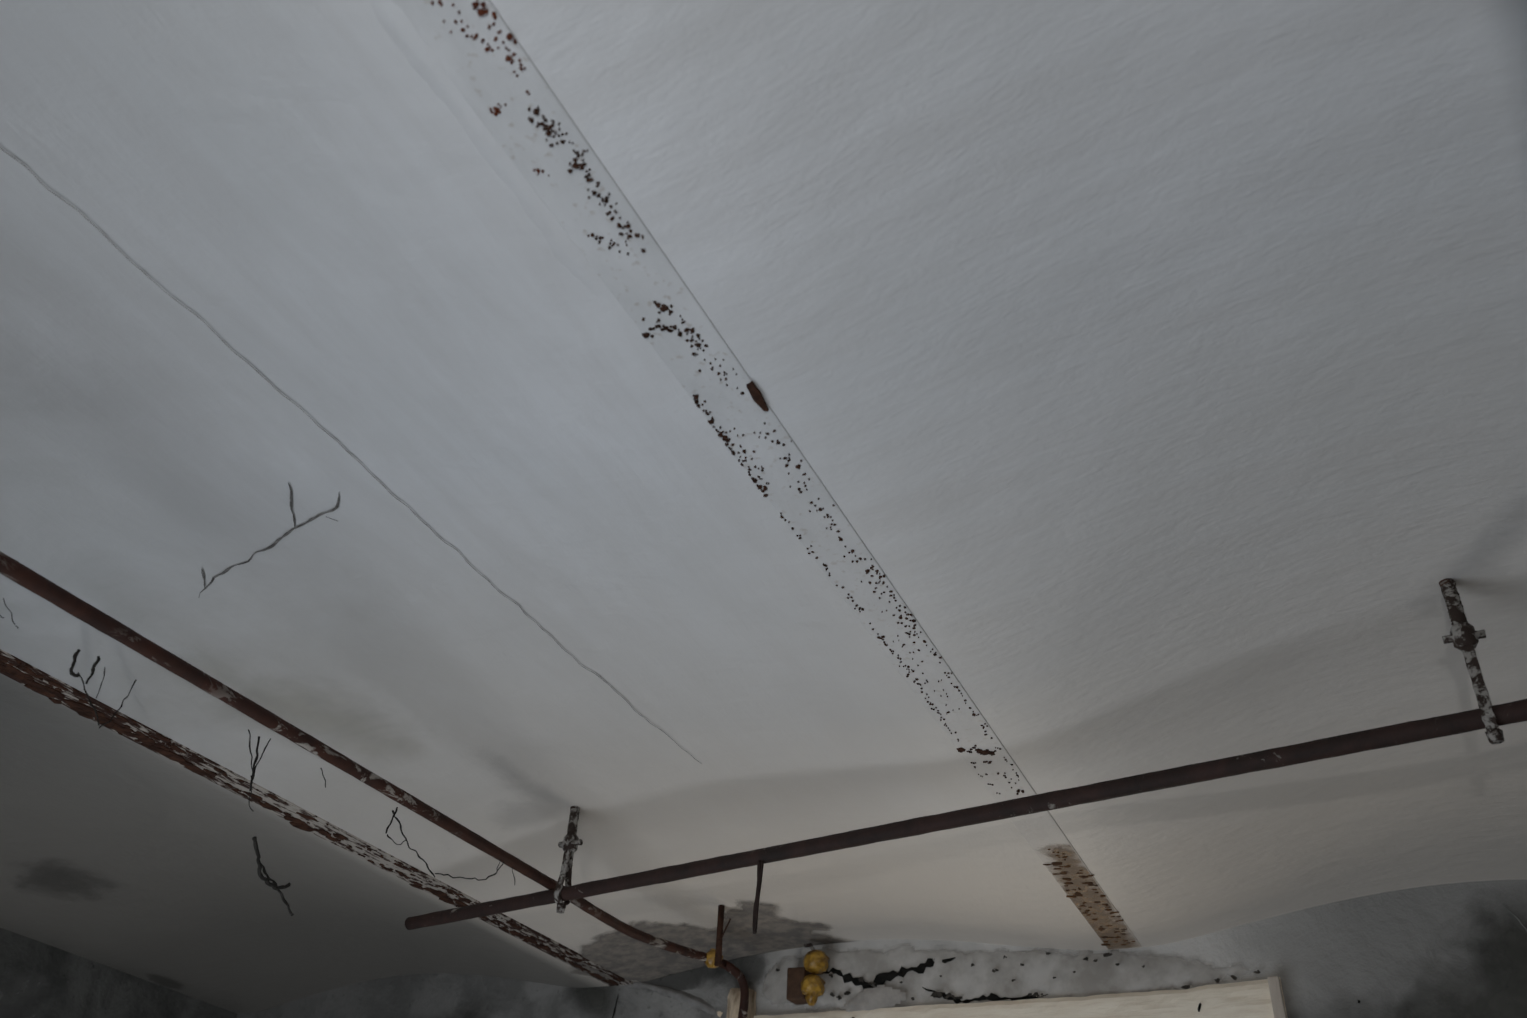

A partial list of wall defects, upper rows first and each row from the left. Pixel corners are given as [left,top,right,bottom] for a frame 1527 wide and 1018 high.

corrosion [431,0,646,256]
crack [0,147,702,764]
corrosion [642,301,745,395]
corrosion [692,394,1024,795]
corrosion [0,655,622,986]
crack [821,957,1048,1004]
corrosion [1043,847,1135,949]
water stain [1396,916,1527,1018]